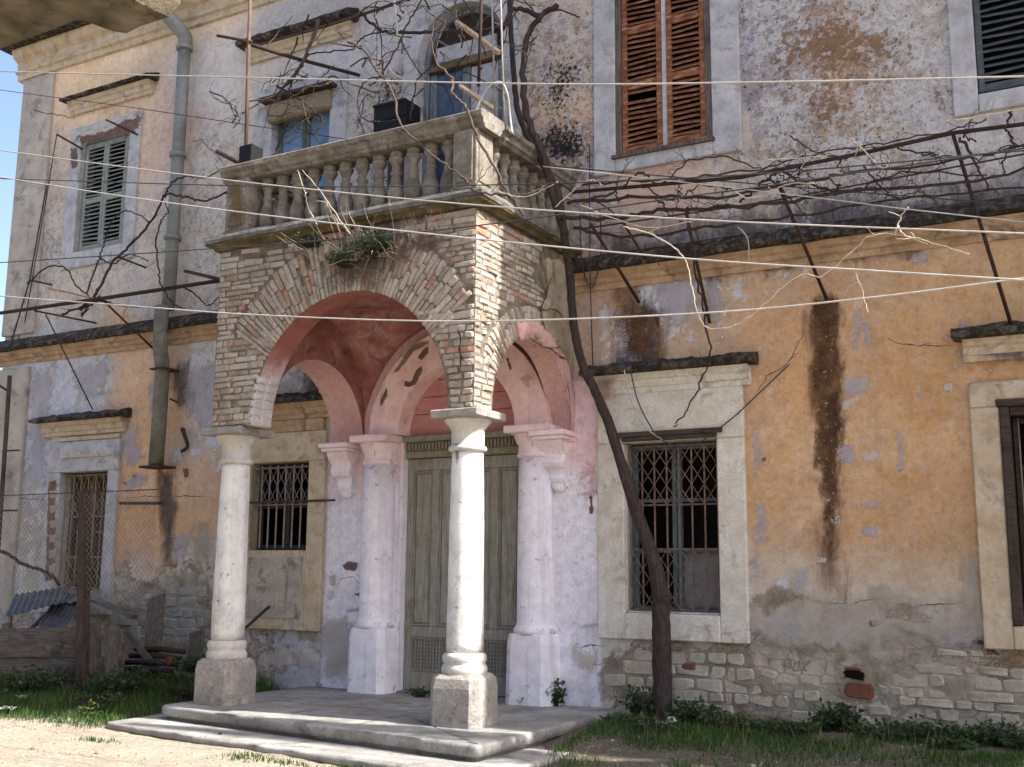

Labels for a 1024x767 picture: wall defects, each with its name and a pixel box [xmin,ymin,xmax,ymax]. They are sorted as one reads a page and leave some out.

peeling [770,11,917,129]
leakage [615,300,661,364]
flaking render [394,341,428,387]
peeling [842,377,868,410]
leakage [810,296,845,580]
flaking render [839,445,879,464]
leakage [158,471,177,560]
flaking render [330,561,357,585]
crack [801,597,964,615]